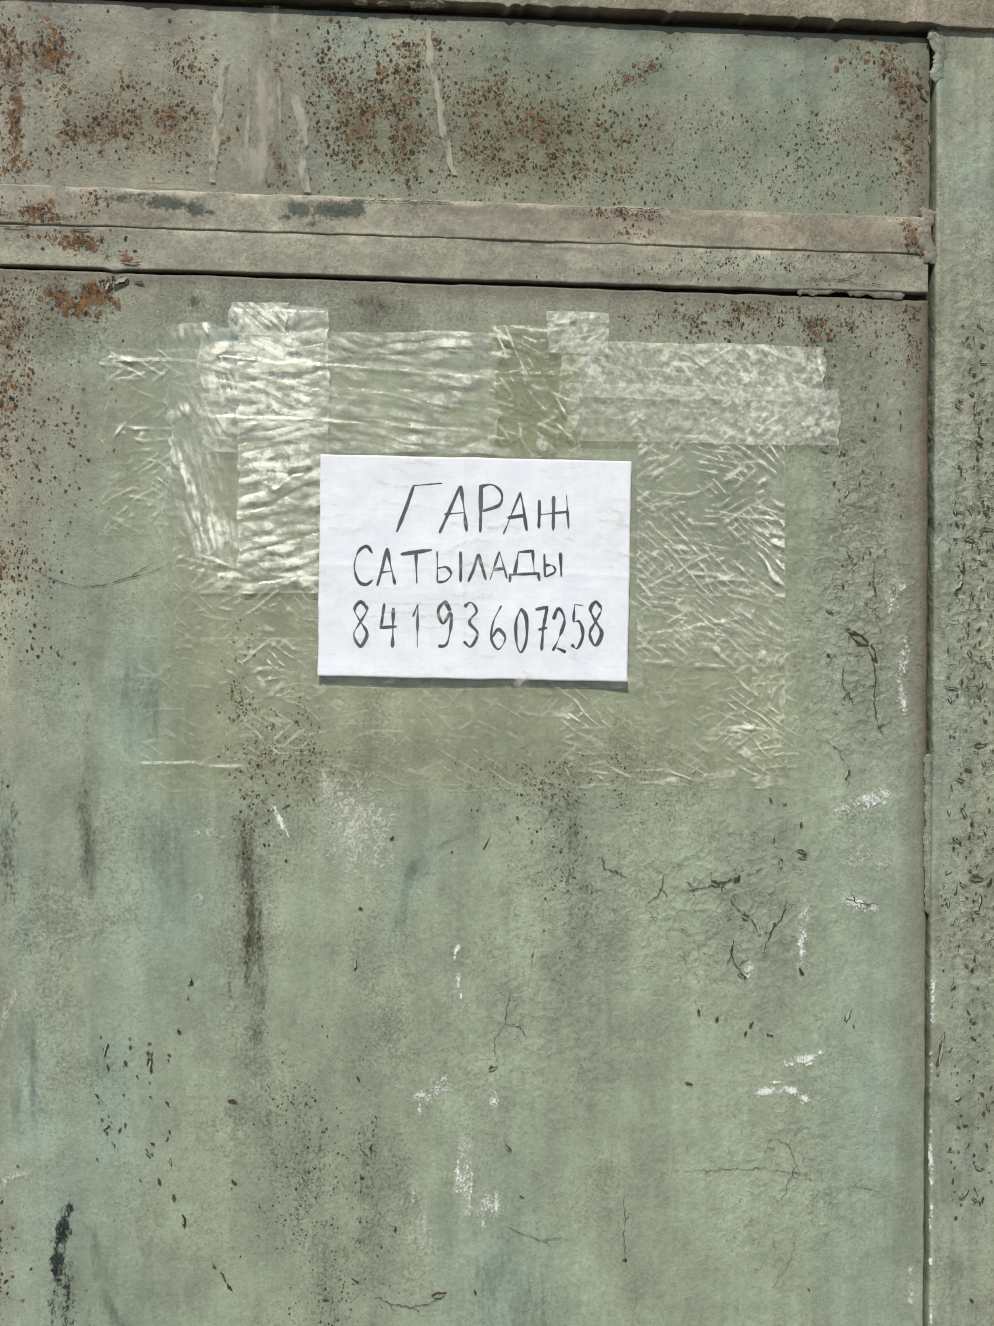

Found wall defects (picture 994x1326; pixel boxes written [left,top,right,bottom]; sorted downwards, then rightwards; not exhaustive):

corrosion [0,0,933,682]
crack [842,660,891,733]
crack [602,857,787,974]
crack [687,1130,816,1198]
water stain [48,1195,90,1326]